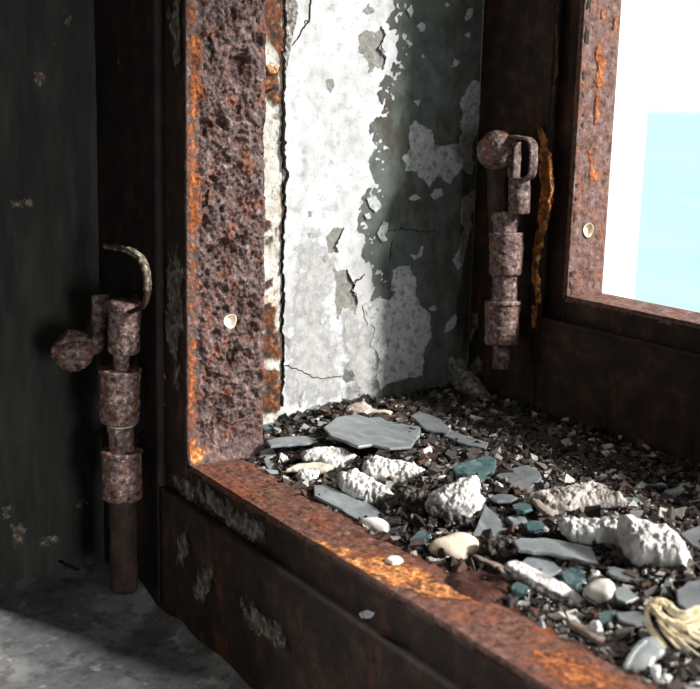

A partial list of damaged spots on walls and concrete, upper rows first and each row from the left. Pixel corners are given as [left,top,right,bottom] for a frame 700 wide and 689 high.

corrosion [265,0,284,117]
corrosion [187,34,209,252]
corrosion [264,220,282,243]
crack [265,0,342,407]
peeling [324,227,344,258]
peeling [333,0,492,399]
corrosion [531,124,555,328]
corrosion [188,340,205,464]
corrosion [263,302,282,413]
damp [193,567,213,602]
corrosion [315,540,519,606]
corrosion [524,650,630,688]